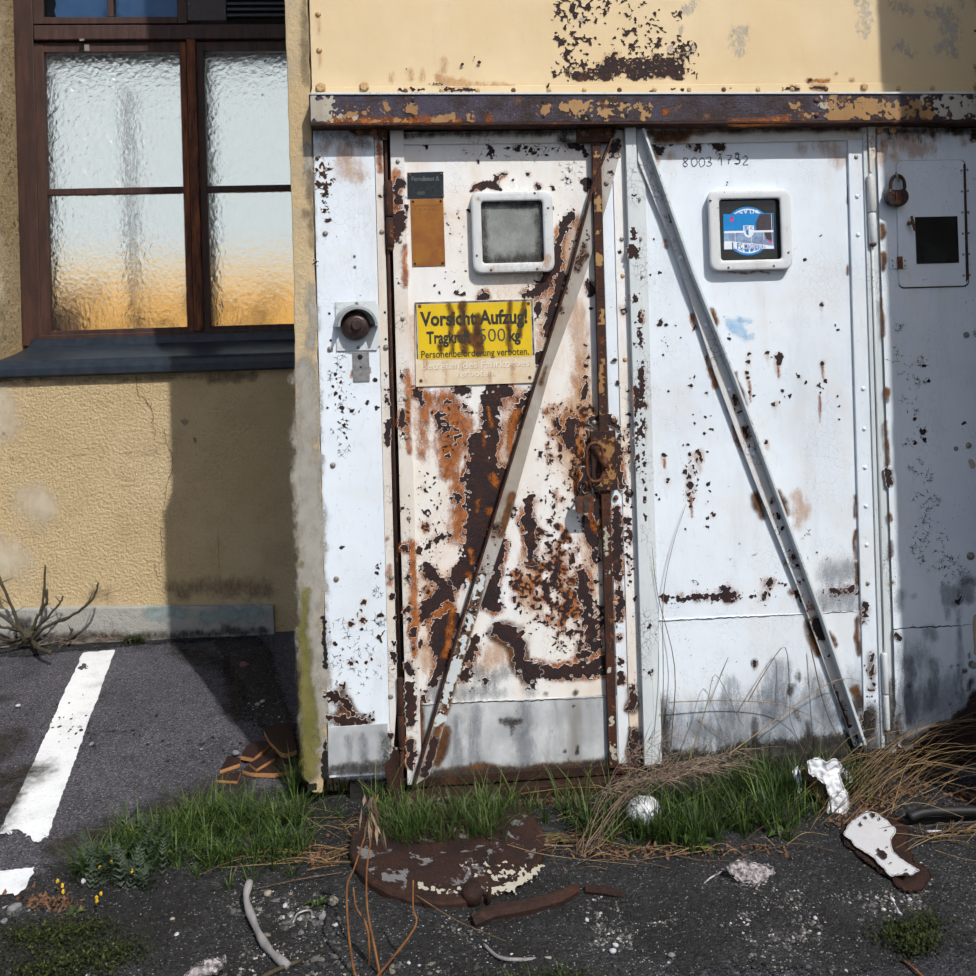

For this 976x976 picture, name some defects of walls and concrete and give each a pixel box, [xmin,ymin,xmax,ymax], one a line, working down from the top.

peeling [536,0,699,121]
corrosion [375,137,402,214]
corrosion [401,244,409,286]
corrosion [705,355,718,389]
crack [121,379,173,577]
corrosion [538,394,627,533]
damp [0,581,270,647]
corrosion [403,369,598,775]
damp [297,588,391,781]
damp [499,718,522,735]
damp [428,746,608,777]
damp [656,679,934,771]